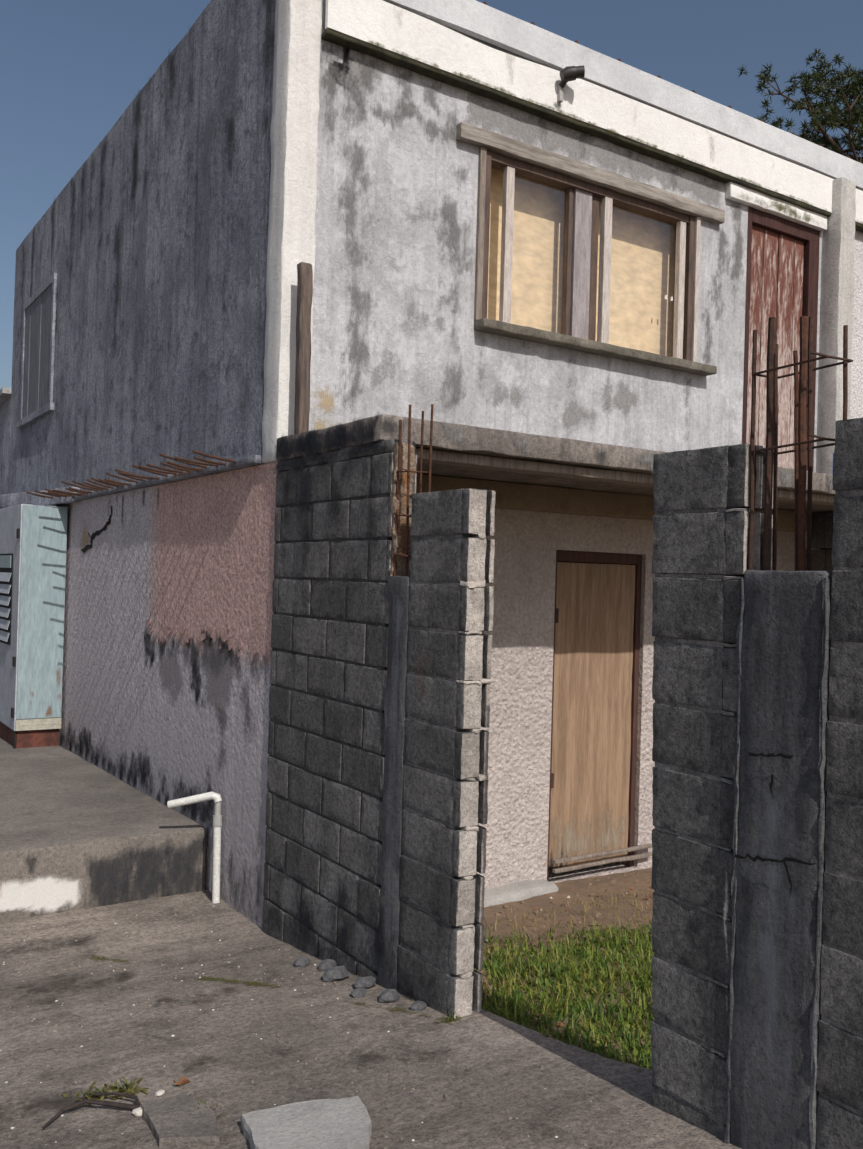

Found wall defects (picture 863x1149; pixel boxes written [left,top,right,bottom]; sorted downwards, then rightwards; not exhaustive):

water stain [263,0,272,87]
water stain [324,44,459,141]
water stain [131,97,147,330]
water stain [339,141,367,263]
water stain [438,201,469,271]
water stain [348,284,395,396]
water stain [442,370,462,407]
water stain [603,382,637,414]
crack [81,507,112,553]
water stain [60,726,215,825]
water stain [89,841,204,906]
crack [734,854,816,899]